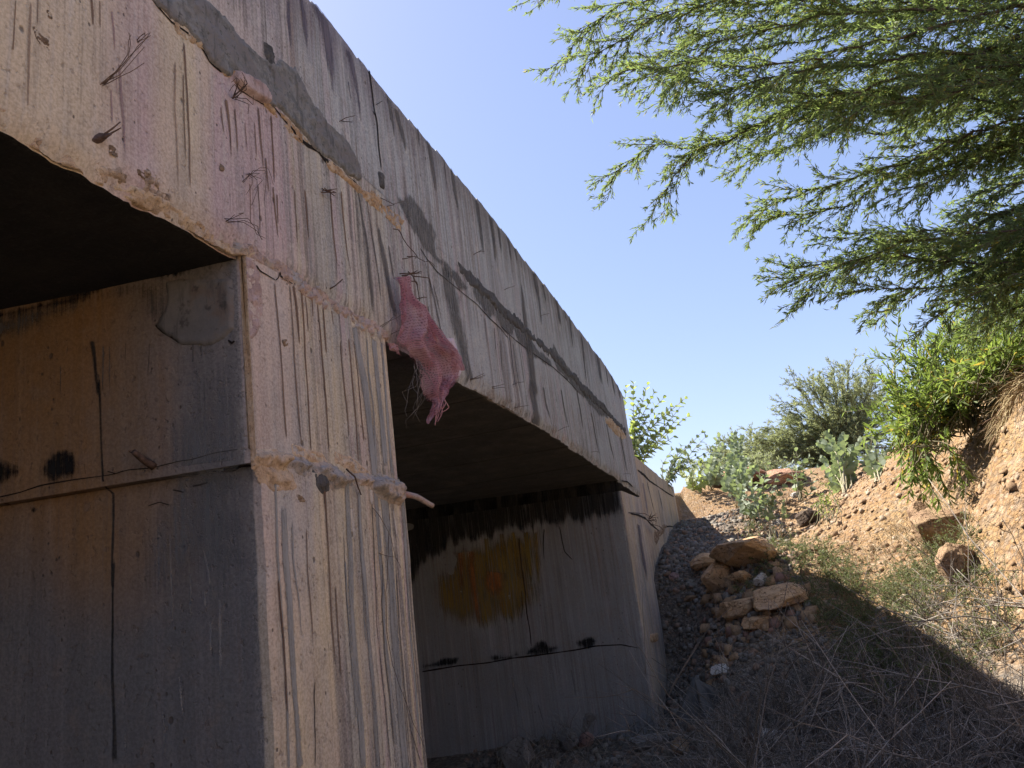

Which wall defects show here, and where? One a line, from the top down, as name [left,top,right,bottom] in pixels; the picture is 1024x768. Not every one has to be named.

water stain [174,44,191,186]
water stain [287,0,334,82]
water stain [346,50,360,112]
spalling [25,137,263,339]
water stain [245,108,278,235]
water stain [294,190,309,243]
spalling [326,160,405,231]
crack [421,250,579,393]
water stain [44,450,75,481]
crack [0,449,251,506]
crack [422,527,637,672]